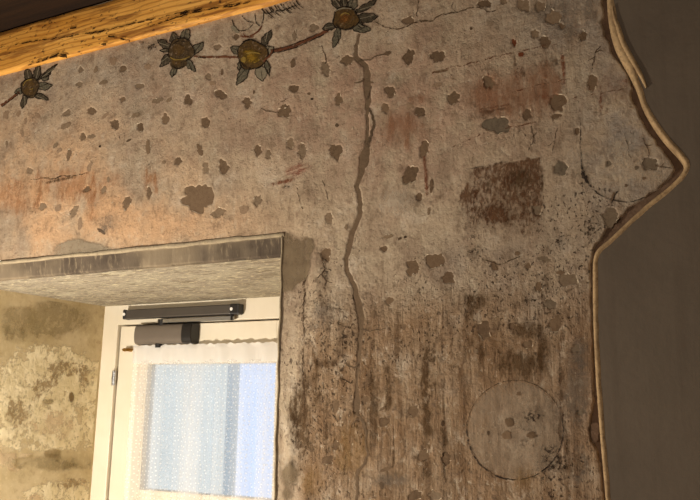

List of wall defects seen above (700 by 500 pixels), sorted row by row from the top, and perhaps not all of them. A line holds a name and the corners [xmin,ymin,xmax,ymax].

crack [375,0,496,30]
spalling [482,116,511,135]
spalling [181,184,226,218]
rust [458,157,543,234]
crack [299,34,389,500]
leakage [498,322,548,379]
flaking render [0,344,99,452]
leakage [289,358,335,455]
leakage [369,367,391,430]
leakage [421,344,448,456]